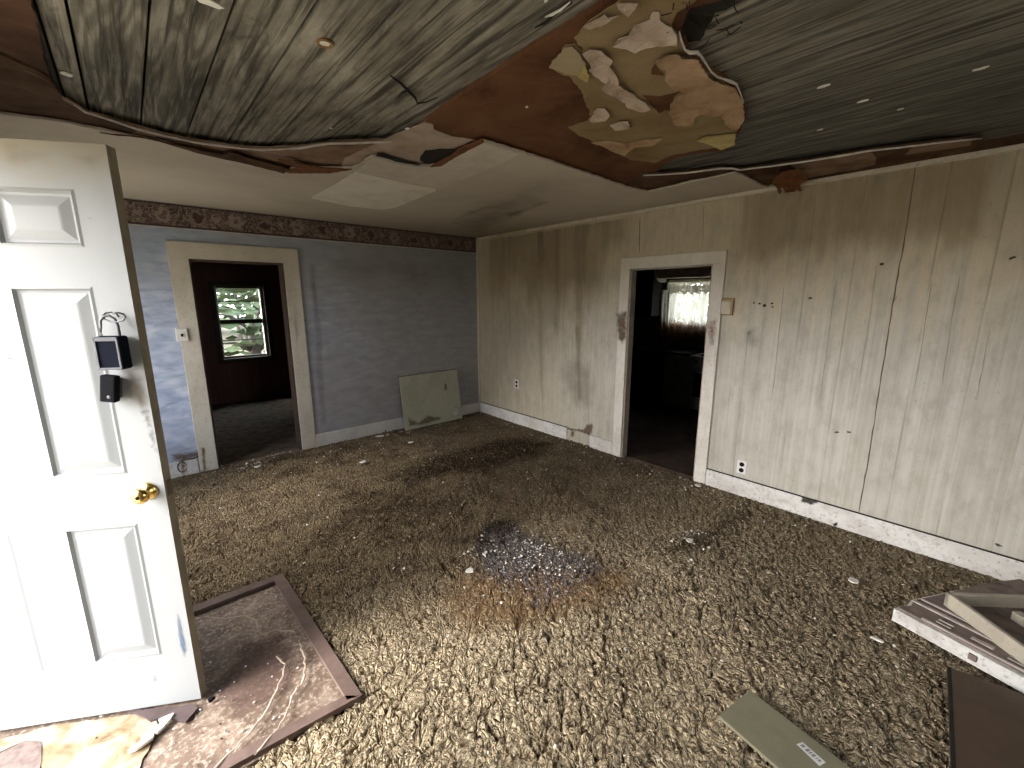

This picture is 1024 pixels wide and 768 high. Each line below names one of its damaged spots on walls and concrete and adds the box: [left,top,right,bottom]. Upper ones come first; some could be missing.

crack [390,75,437,105]
peeling [772,167,808,194]
crack [859,167,916,511]